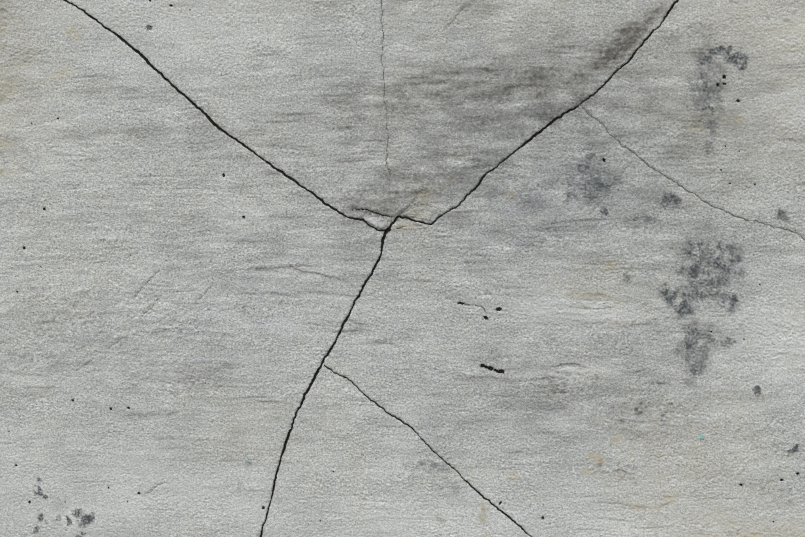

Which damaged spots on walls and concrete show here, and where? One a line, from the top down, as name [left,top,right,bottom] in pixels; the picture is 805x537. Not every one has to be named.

crack [444,0,805,240]
crack [64,0,532,537]
leakage [657,221,752,388]